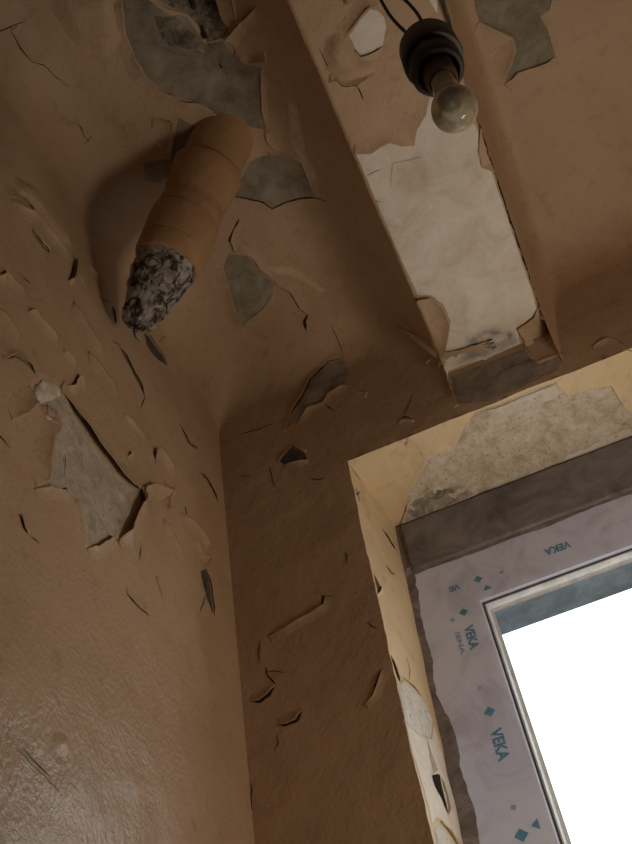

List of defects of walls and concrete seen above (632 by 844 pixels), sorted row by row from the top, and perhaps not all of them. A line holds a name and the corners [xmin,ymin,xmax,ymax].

peeling [113,0,270,183]
peeling [335,0,386,61]
peeling [430,0,453,29]
peeling [468,0,560,91]
peeling [230,150,327,215]
peeling [354,94,632,523]
peeling [6,380,177,560]
peeling [397,676,463,844]